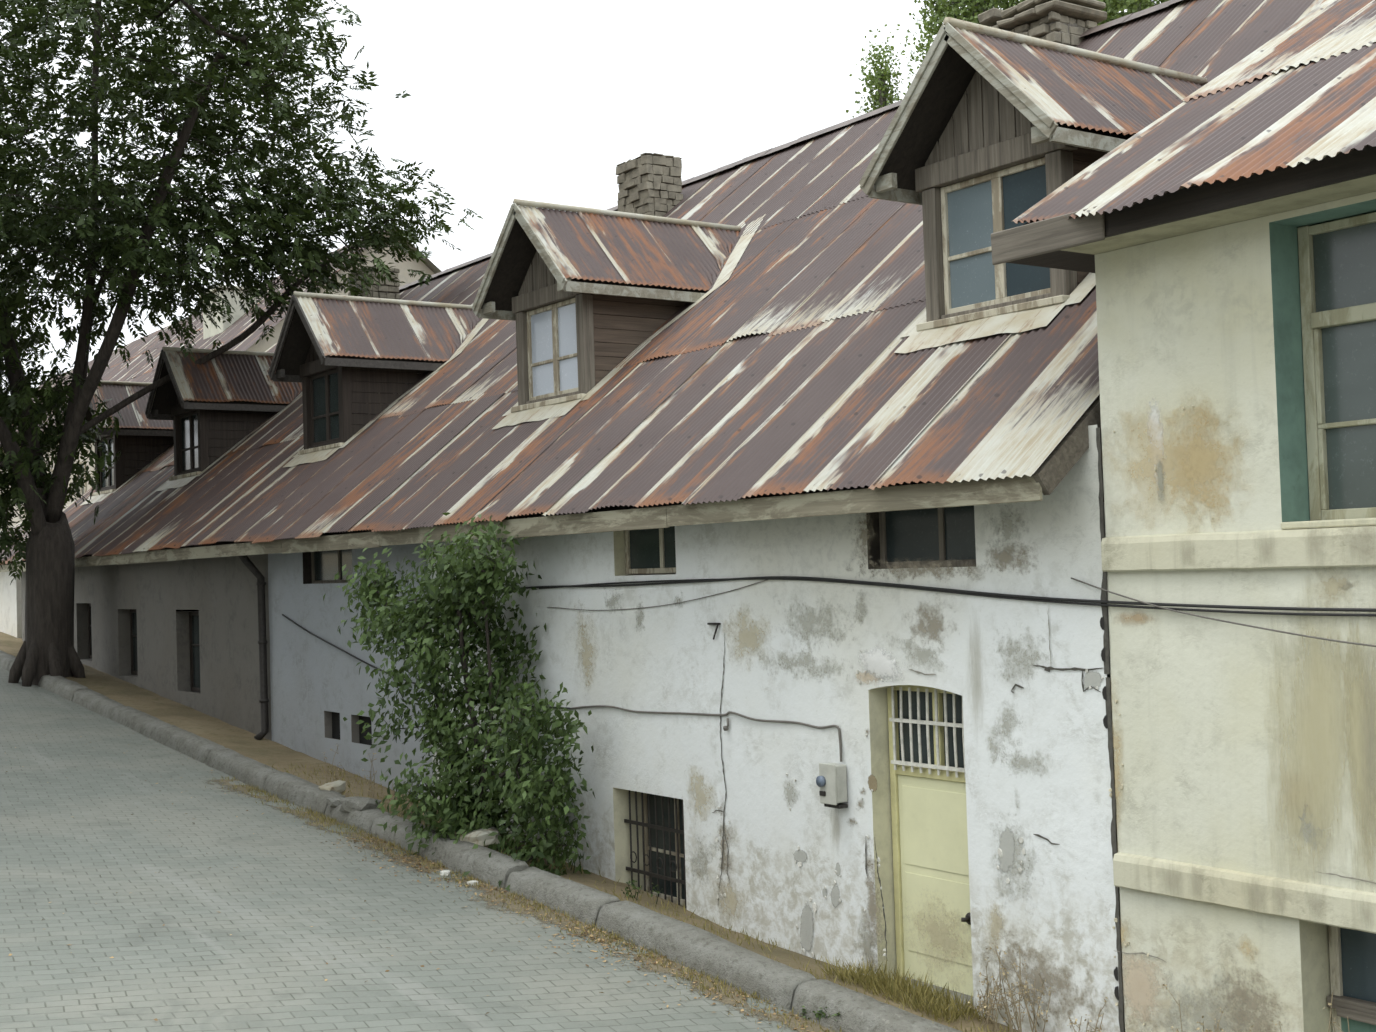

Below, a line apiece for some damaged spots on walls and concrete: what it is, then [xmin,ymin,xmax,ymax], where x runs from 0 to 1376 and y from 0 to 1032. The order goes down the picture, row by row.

water stain [1281,634,1376,850]
spalling [996,827,1026,884]